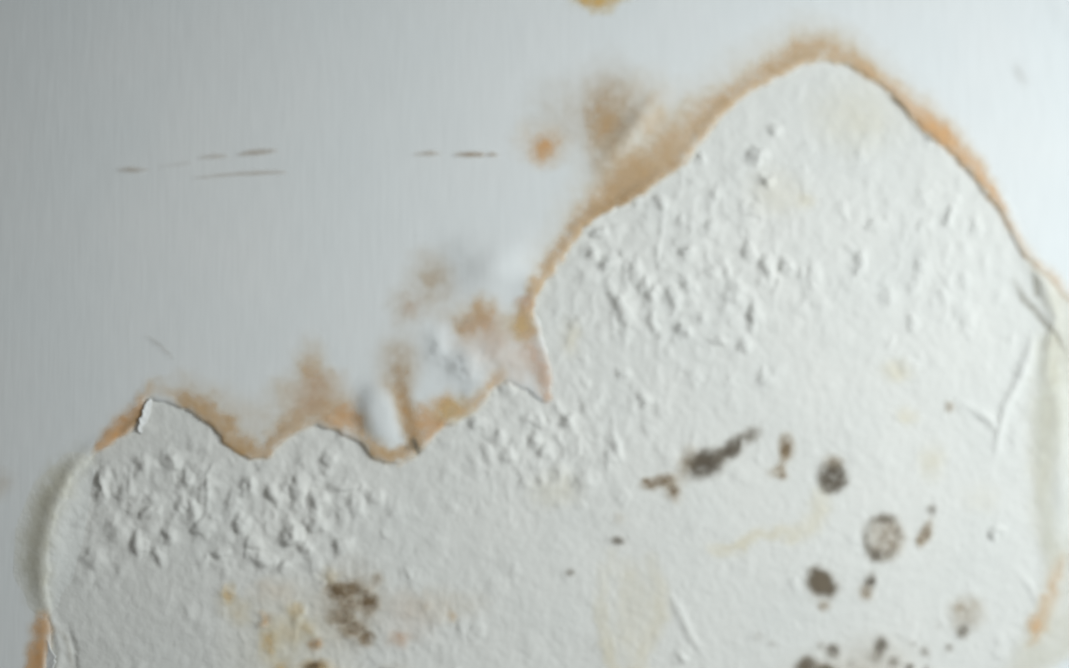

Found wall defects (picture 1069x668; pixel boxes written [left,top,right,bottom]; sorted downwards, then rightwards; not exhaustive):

leakage [889,87,999,199]
leakage [518,42,875,338]
leakage [96,404,144,449]
leakage [180,394,324,457]
leakage [370,366,421,461]
leakage [644,476,679,496]
leakage [687,436,744,476]
leakage [781,438,792,457]
leakage [820,460,848,493]
leakage [809,568,837,596]
leakage [331,583,377,644]
leakage [798,657,831,668]